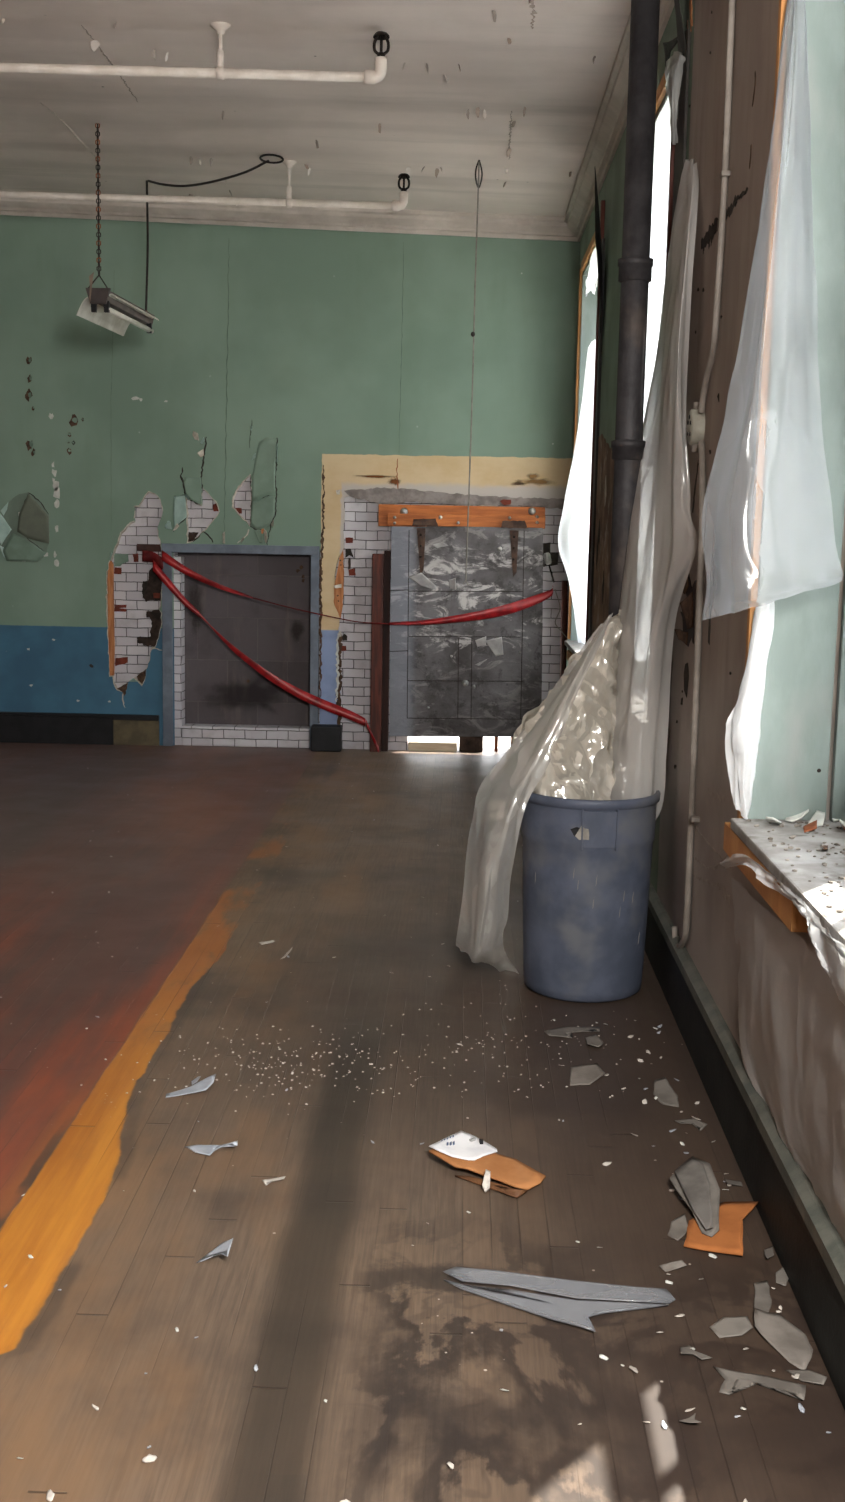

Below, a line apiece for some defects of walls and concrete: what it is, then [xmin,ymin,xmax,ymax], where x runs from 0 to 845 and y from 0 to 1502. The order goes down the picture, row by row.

crack [492,0,537,44]
peeling [0,357,84,566]
spalling [89,425,278,707]